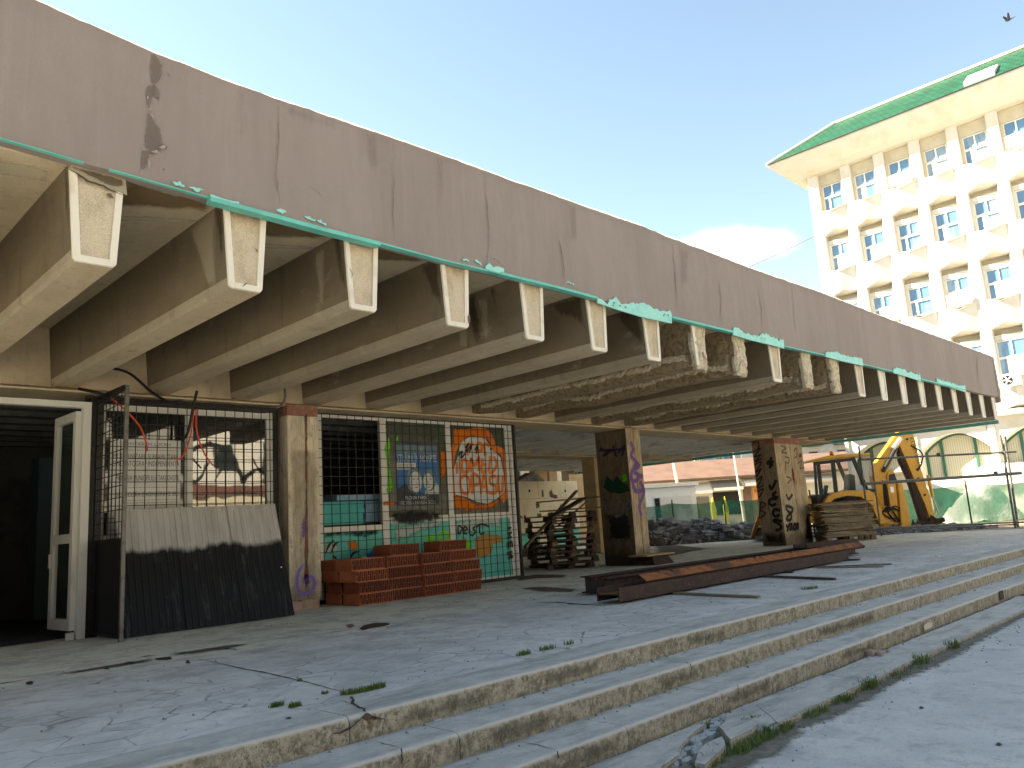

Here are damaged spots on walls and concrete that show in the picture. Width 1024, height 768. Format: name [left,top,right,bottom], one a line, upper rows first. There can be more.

peeling [141,54,170,169]
peeling [596,297,672,324]
spalling [481,327,784,416]
spalling [599,351,864,424]
crack [59,620,403,763]